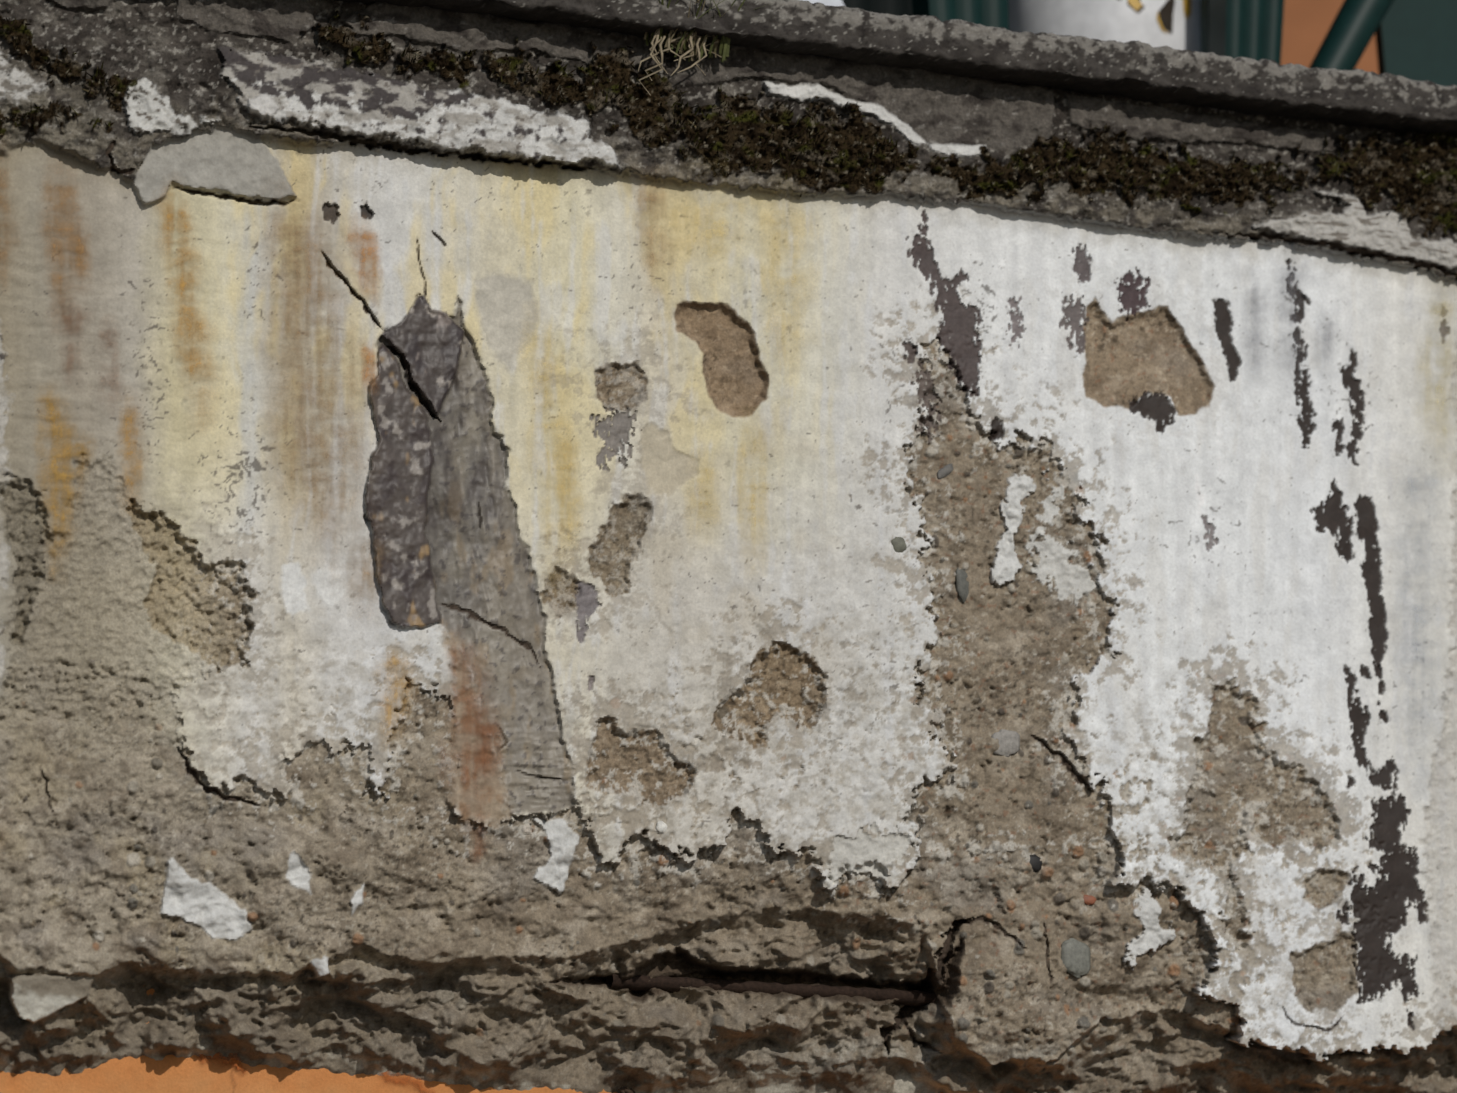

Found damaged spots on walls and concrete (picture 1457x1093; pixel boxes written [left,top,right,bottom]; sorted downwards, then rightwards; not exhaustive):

crack [322,251,382,327]
crack [417,230,447,296]
peeling [474,272,541,370]
spalling [1059,243,1243,433]
peeling [1286,258,1367,465]
spalling [0,293,1457,1093]
crack [549,915,1054,1053]